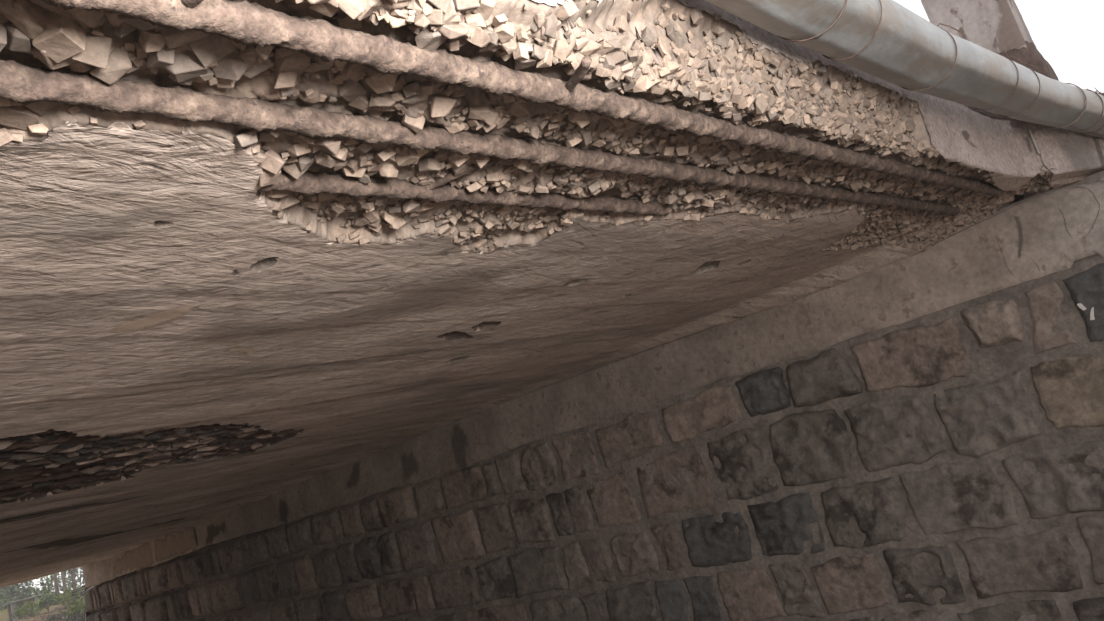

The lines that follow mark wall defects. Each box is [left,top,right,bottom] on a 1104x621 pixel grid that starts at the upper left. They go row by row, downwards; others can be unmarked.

spalling [0,0,1054,254]
spalling [0,423,304,504]